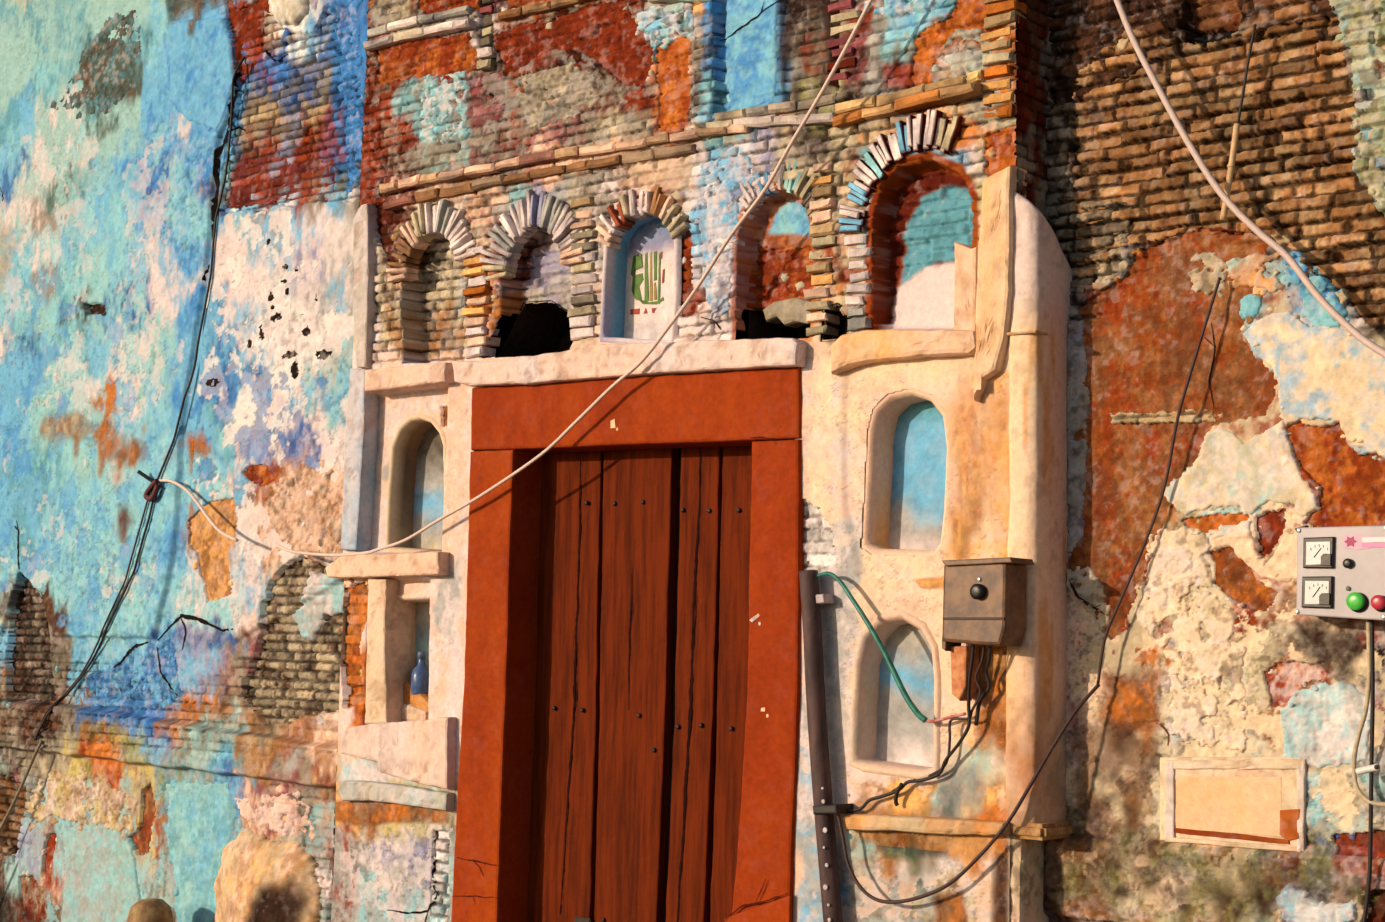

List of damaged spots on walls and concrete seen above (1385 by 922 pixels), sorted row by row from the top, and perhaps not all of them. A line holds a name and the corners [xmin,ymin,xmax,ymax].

peeling [50,10,141,119]
spalling [247,264,298,348]
spalling [281,350,299,379]
spalling [1046,0,1385,769]
spalling [190,499,237,602]
spalling [243,460,369,726]
spalling [803,499,836,574]
crack [114,614,233,696]
peeling [0,766,316,922]
damp [1043,722,1175,922]
damp [1178,863,1309,922]
peeling [1276,883,1385,922]